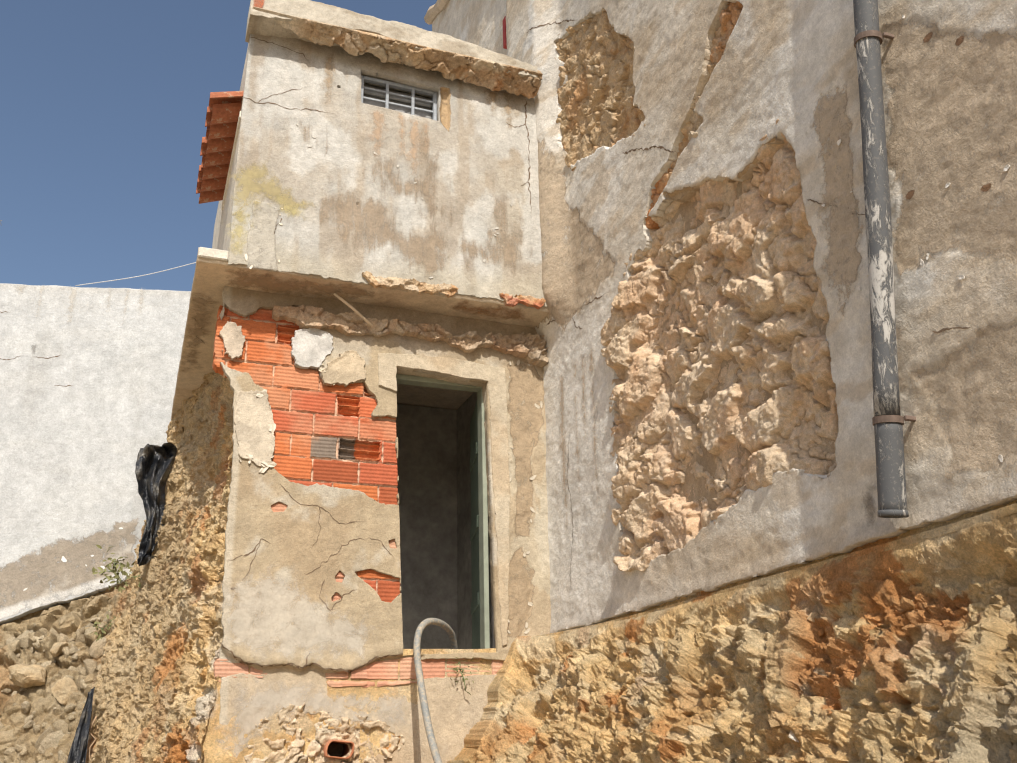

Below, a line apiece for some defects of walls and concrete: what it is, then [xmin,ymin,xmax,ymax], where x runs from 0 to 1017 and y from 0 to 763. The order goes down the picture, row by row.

crack [240,89,333,114]
peeling [881,15,1017,276]
spalling [212,1,868,572]
crack [231,539,271,624]
crack [276,467,393,611]
spalling [331,569,400,603]
peeling [507,548,535,637]
crack [219,642,408,673]
spalling [244,699,405,763]